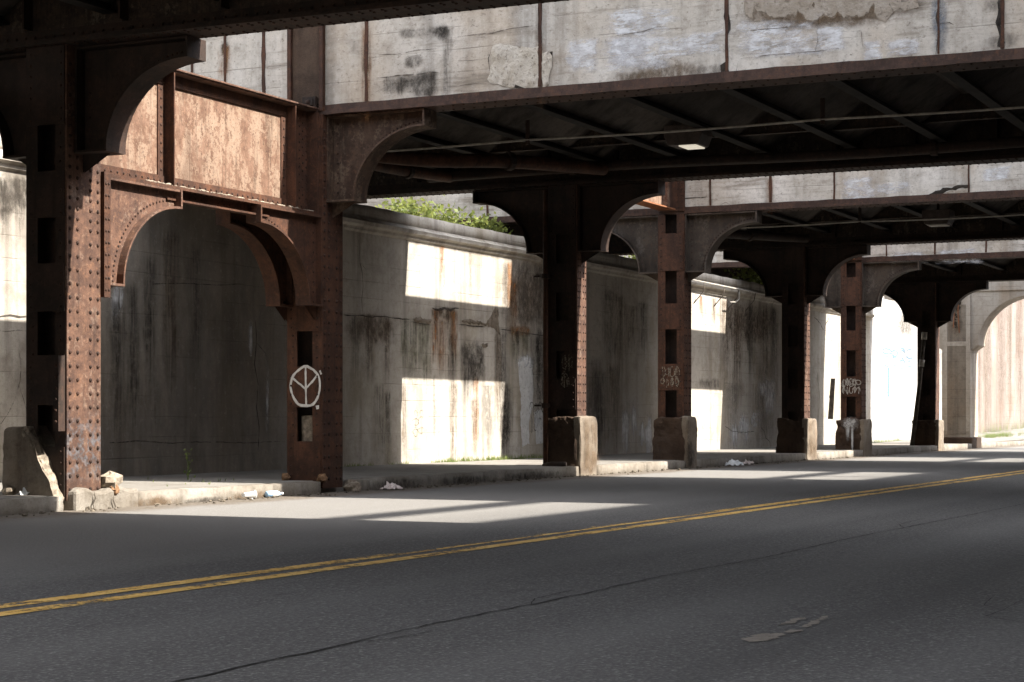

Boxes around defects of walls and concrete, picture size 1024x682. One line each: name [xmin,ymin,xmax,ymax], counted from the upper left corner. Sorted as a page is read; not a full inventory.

damp [392,59,447,96]
damp [433,27,448,38]
spalling [487,43,553,89]
spalling [724,0,919,55]
peeling [865,40,916,60]
corrosion [433,310,456,370]
damp [453,345,483,413]